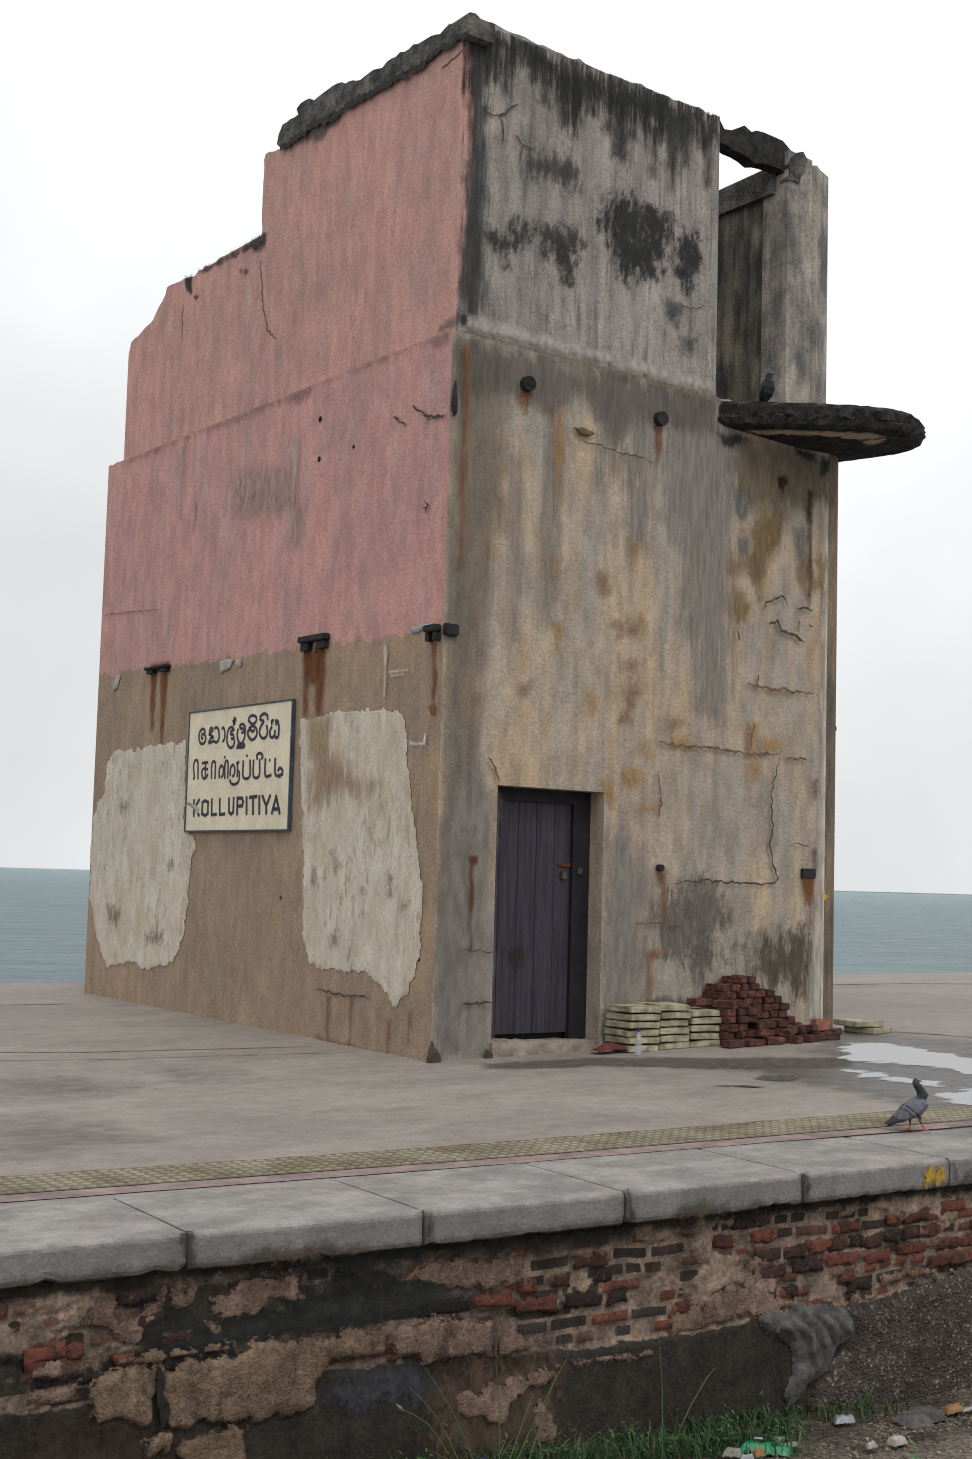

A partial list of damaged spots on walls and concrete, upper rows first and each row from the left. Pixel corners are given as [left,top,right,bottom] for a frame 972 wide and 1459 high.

crack [260,261,276,339]
leakage [429,30,830,719]
peeling [89,740,196,970]
corrosion [150,663,169,741]
corrosion [303,649,325,717]
peeling [299,708,423,1007]
corrosion [470,856,478,951]
leakage [443,773,972,1121]
crack [657,675,814,886]
crack [736,595,813,643]
flaking render [676,1163,972,1299]
peeling [113,1231,387,1459]